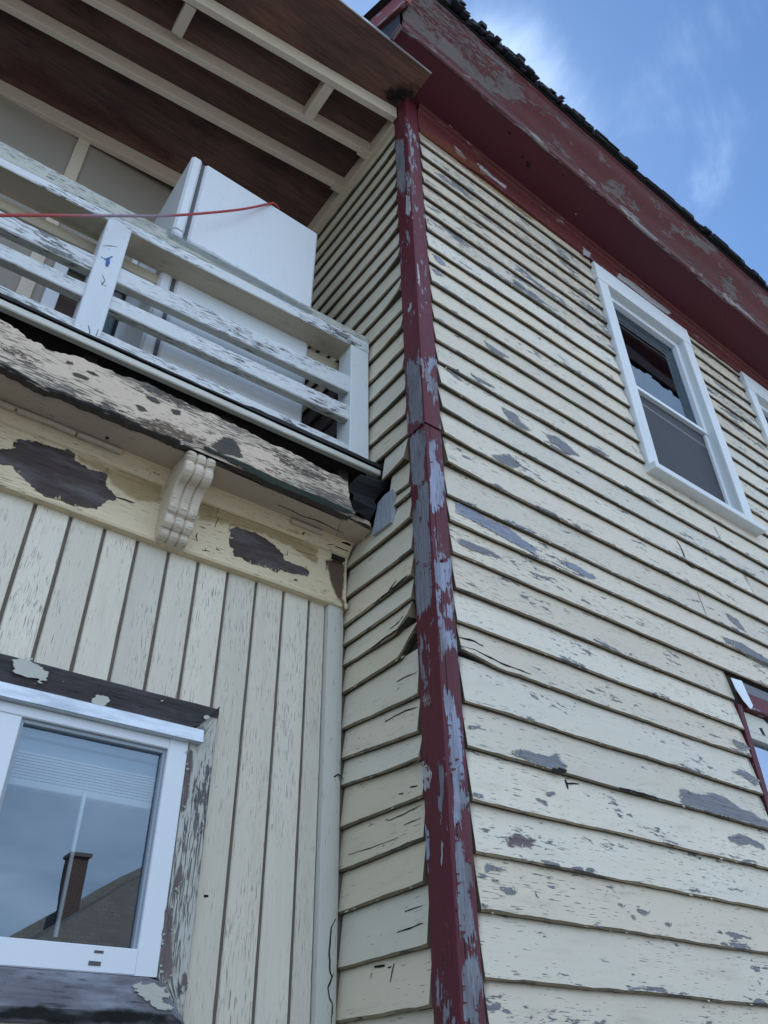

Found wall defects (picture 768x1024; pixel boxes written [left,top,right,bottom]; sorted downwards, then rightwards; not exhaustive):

peeling [454,146,506,188]
peeling [617,274,672,315]
spalling [0,439,116,510]
peeling [406,356,537,663]
spalling [229,527,309,581]
crack [459,637,530,674]
peeling [181,749,193,812]
peeling [512,748,568,769]
peeling [679,788,768,850]
peeling [421,684,489,1024]
peeling [159,865,188,994]
crack [327,919,336,1024]